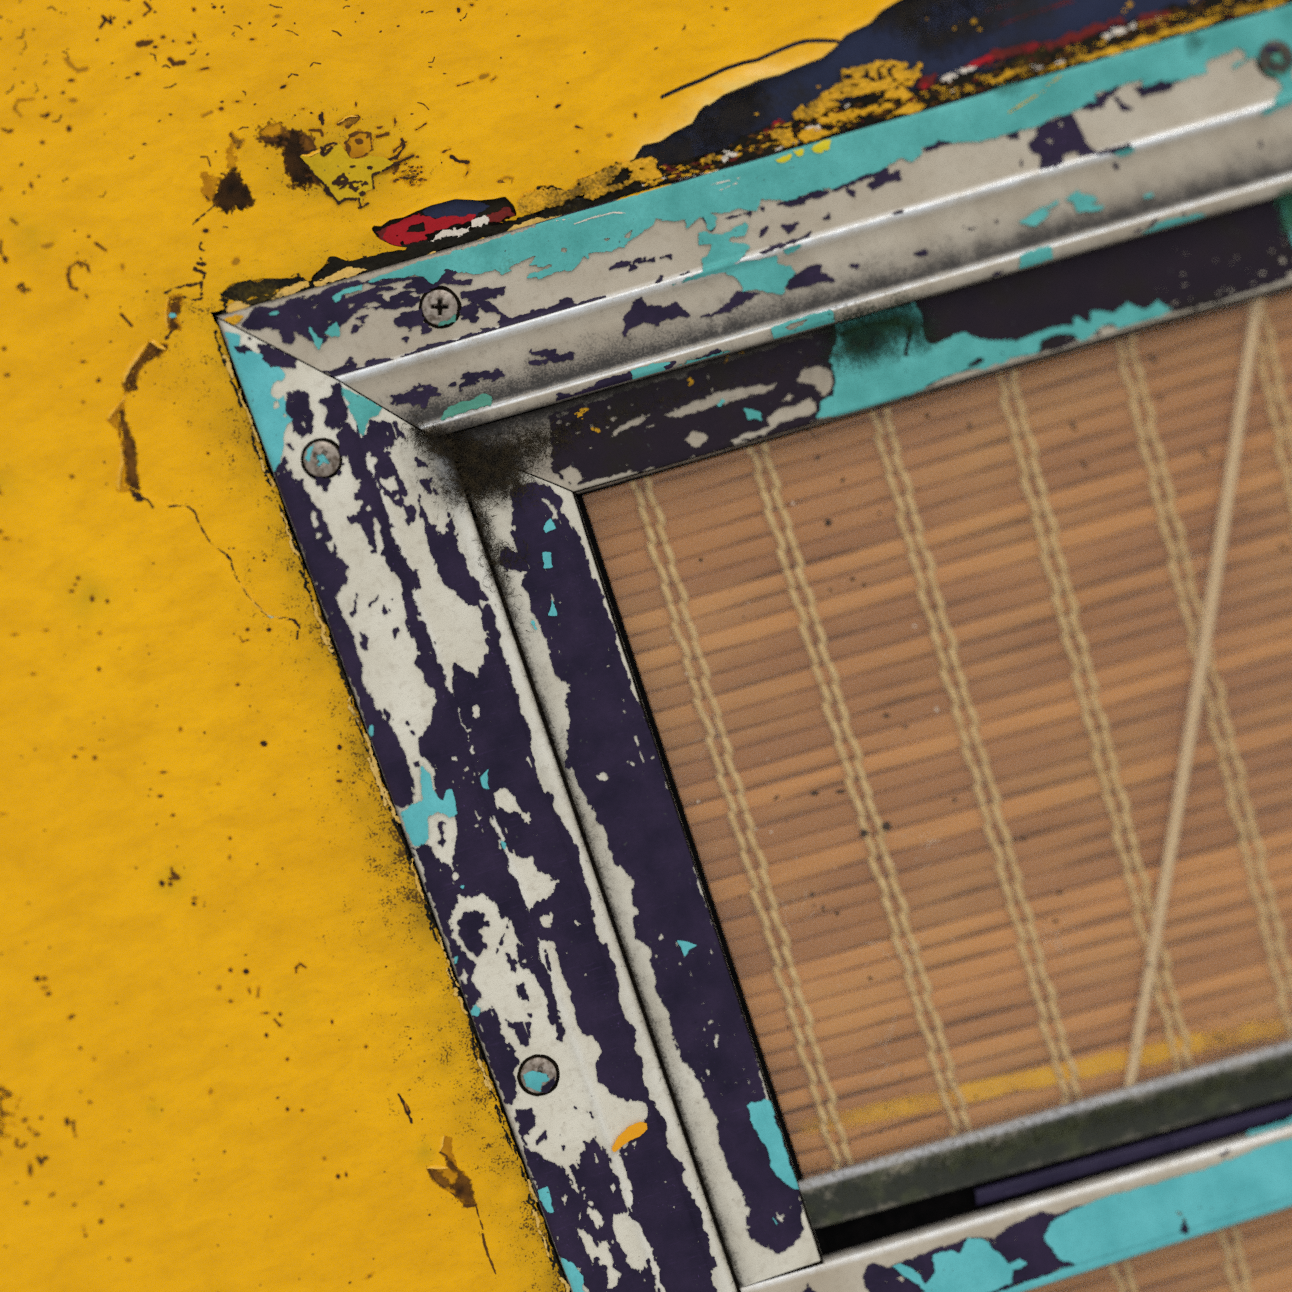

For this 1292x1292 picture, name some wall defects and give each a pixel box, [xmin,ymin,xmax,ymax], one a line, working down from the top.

spalling [0,16,88,133]
spalling [88,0,157,41]
spalling [136,33,209,88]
peeling [294,102,429,209]
spalling [66,252,90,298]
crack [139,495,301,640]
spalling [159,867,185,887]
spalling [0,1087,48,1184]
peeling [427,1136,496,1274]